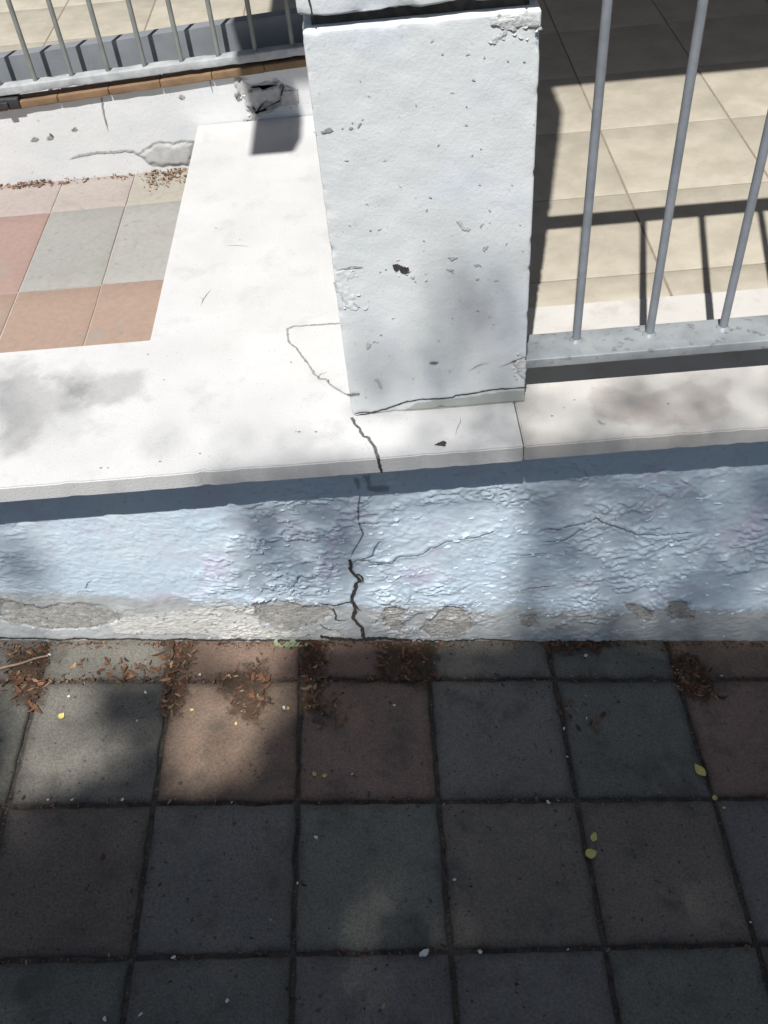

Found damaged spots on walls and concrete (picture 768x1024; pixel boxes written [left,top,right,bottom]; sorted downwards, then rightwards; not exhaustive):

flaking render [488,10,543,44]
flaking render [234,76,298,122]
crack [286,323,525,473]
peeling [0,536,346,641]
crack [0,496,615,643]
flaking render [366,545,549,639]
crack [514,518,692,556]